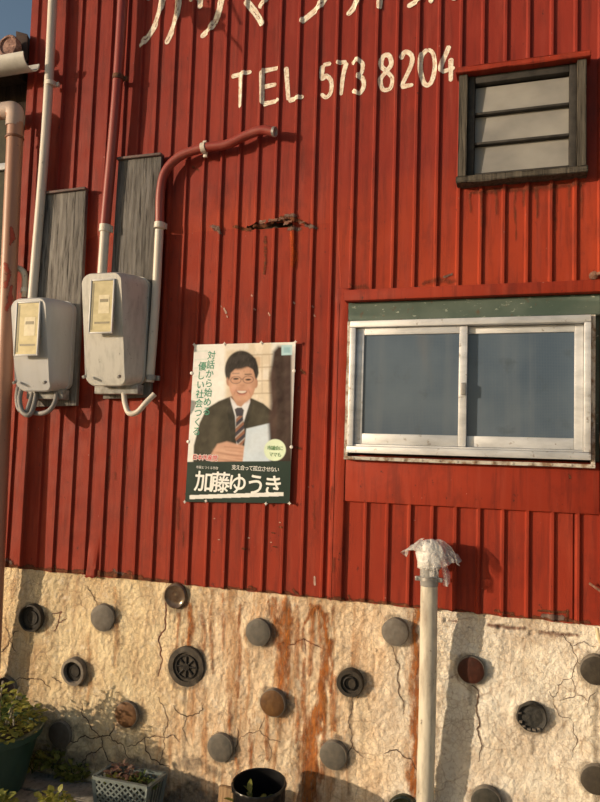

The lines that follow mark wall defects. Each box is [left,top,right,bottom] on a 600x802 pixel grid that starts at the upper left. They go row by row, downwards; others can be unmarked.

peeling [259,217,318,231]
crack [157,602,167,677]
corrosion [438,608,591,624]
crack [71,697,204,767]
corrosion [98,569,420,802]
crack [391,646,405,712]
crack [472,685,483,762]
crack [549,634,596,757]